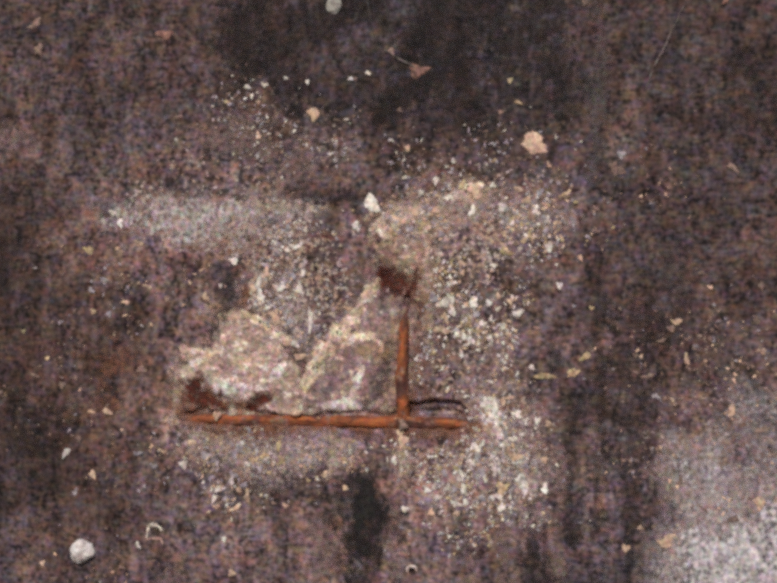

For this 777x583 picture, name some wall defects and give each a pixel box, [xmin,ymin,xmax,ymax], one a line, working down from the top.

peeling [173,75,365,180]
peeling [593,129,653,232]
corrosion [377,266,421,297]
spalling [59,110,597,561]
corrosion [185,305,482,435]
damp [344,468,408,583]
damp [479,395,532,461]
peeling [605,441,689,495]
peeling [656,503,708,548]
peeling [629,303,777,486]
damp [658,438,777,583]
peeling [718,452,777,527]